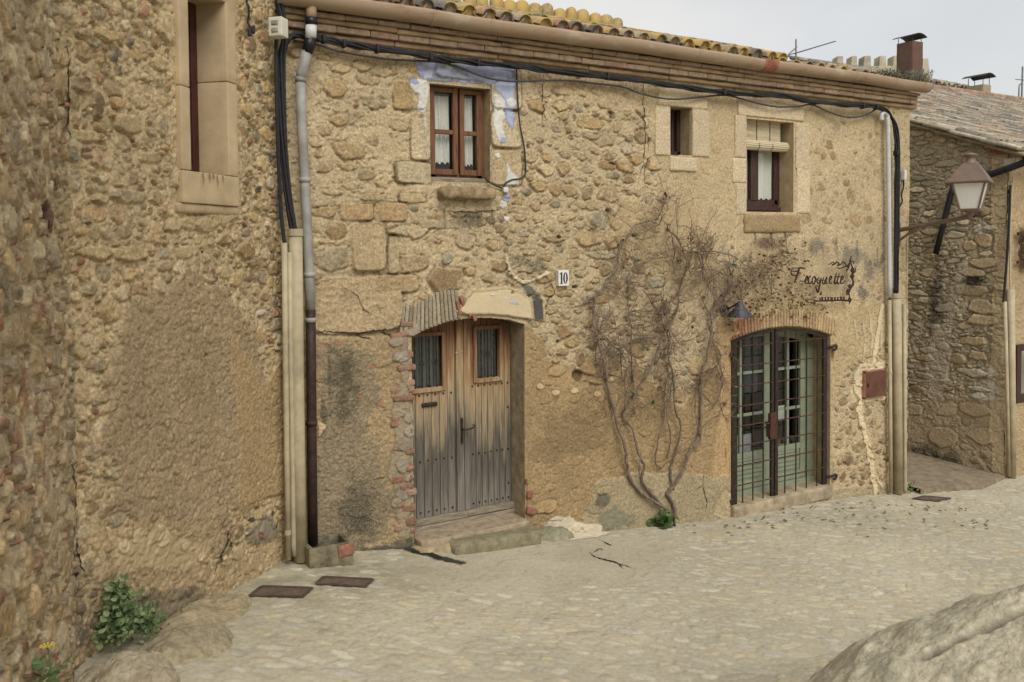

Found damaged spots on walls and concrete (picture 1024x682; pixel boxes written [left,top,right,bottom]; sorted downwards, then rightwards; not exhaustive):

crack [64,42,72,146]
peeling [409,60,519,221]
crack [319,289,395,339]
crack [71,465,85,596]
crack [214,525,233,575]